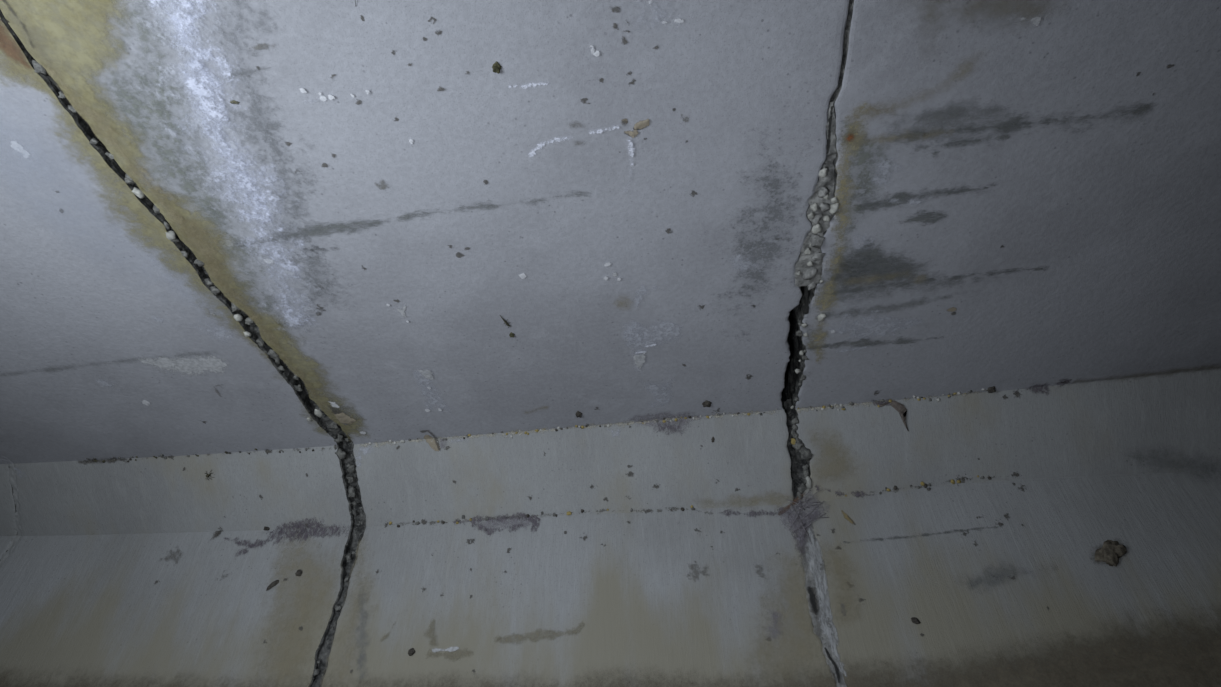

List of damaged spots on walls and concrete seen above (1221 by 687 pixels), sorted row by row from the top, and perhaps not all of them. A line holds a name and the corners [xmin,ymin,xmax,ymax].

crack [3,0,76,113]
water stain [103,0,328,326]
water stain [845,126,945,223]
crack [89,138,366,687]
crack [782,0,852,687]
water stain [775,622,1221,687]